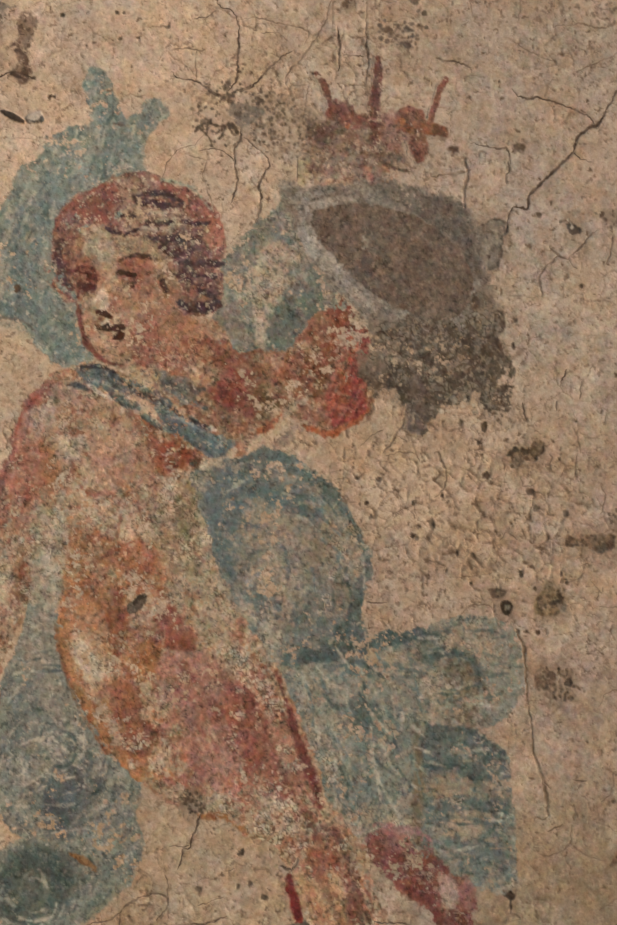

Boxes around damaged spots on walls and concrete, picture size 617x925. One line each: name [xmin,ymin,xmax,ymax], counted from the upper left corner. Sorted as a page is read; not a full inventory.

crack [0,71,36,80]
spalling [0,0,40,85]
crack [171,0,370,119]
crack [436,57,470,68]
crack [162,129,271,223]
crack [431,142,511,208]
crack [506,88,617,233]